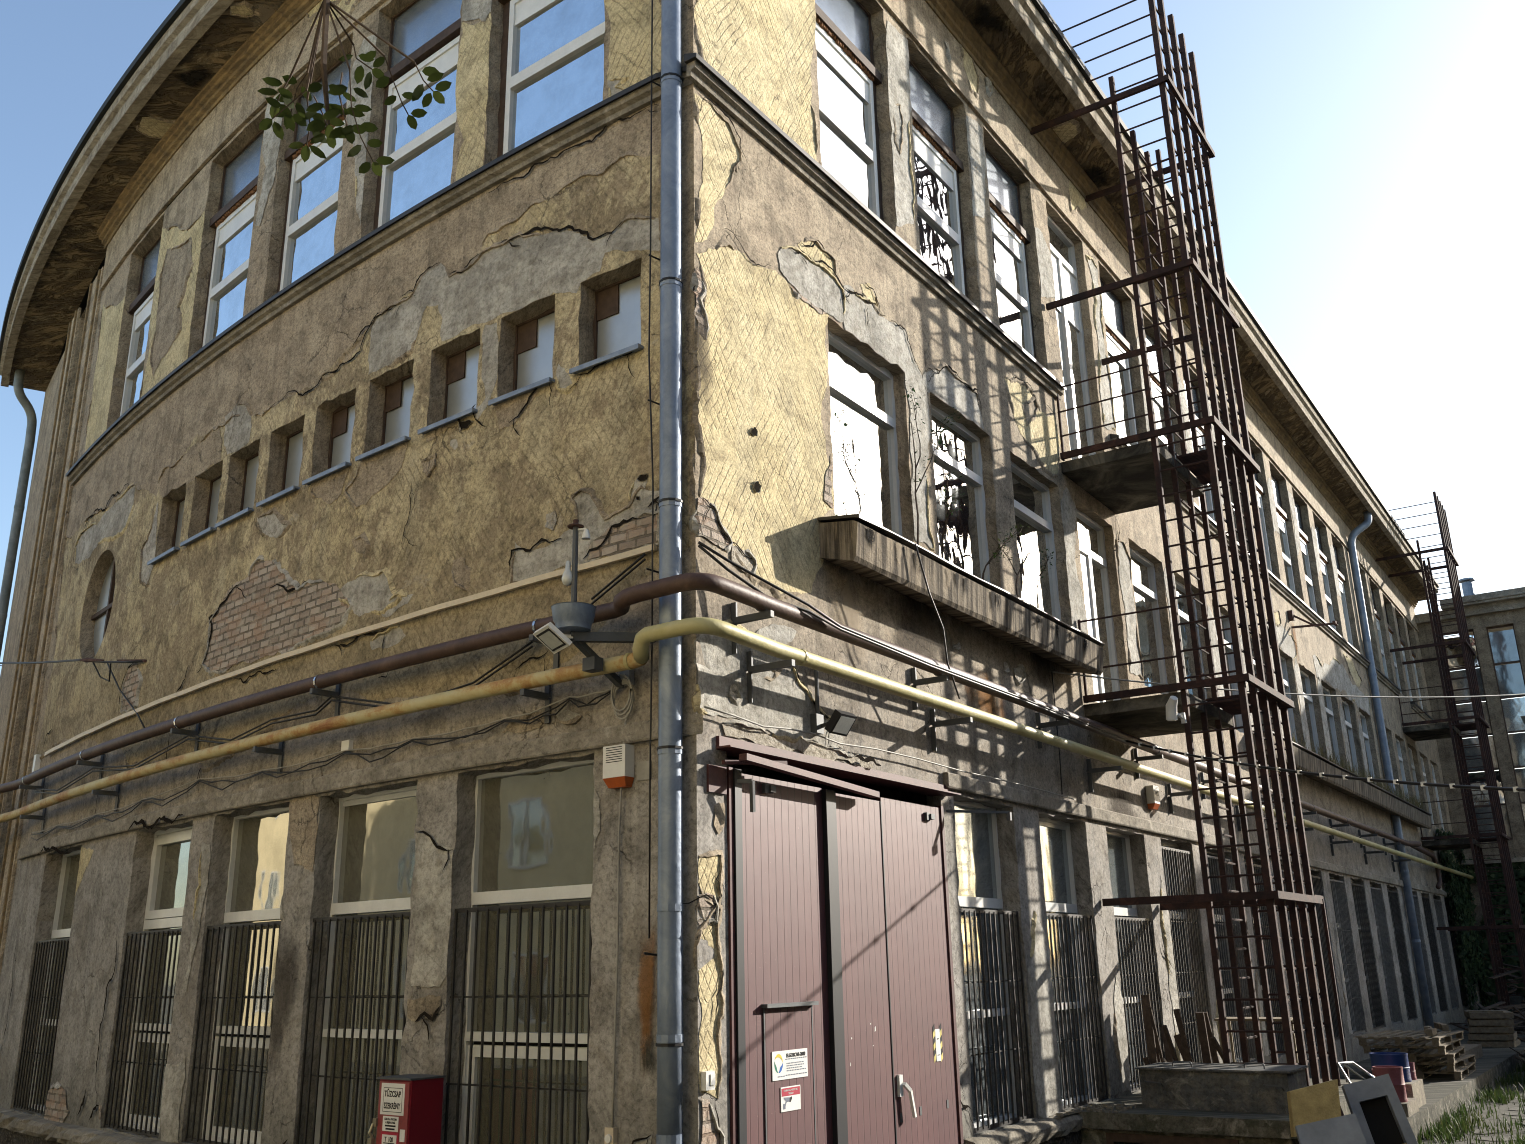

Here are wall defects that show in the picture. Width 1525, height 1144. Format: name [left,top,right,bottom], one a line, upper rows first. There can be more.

peeling [136,116,176,140]
flaking render [255,93,284,226]
peeling [694,0,818,161]
crack [271,222,622,407]
peeling [682,93,986,601]
peeling [36,151,661,773]
flaking render [691,619,874,768]
crack [415,1006,440,1044]
peeling [693,849,726,1144]